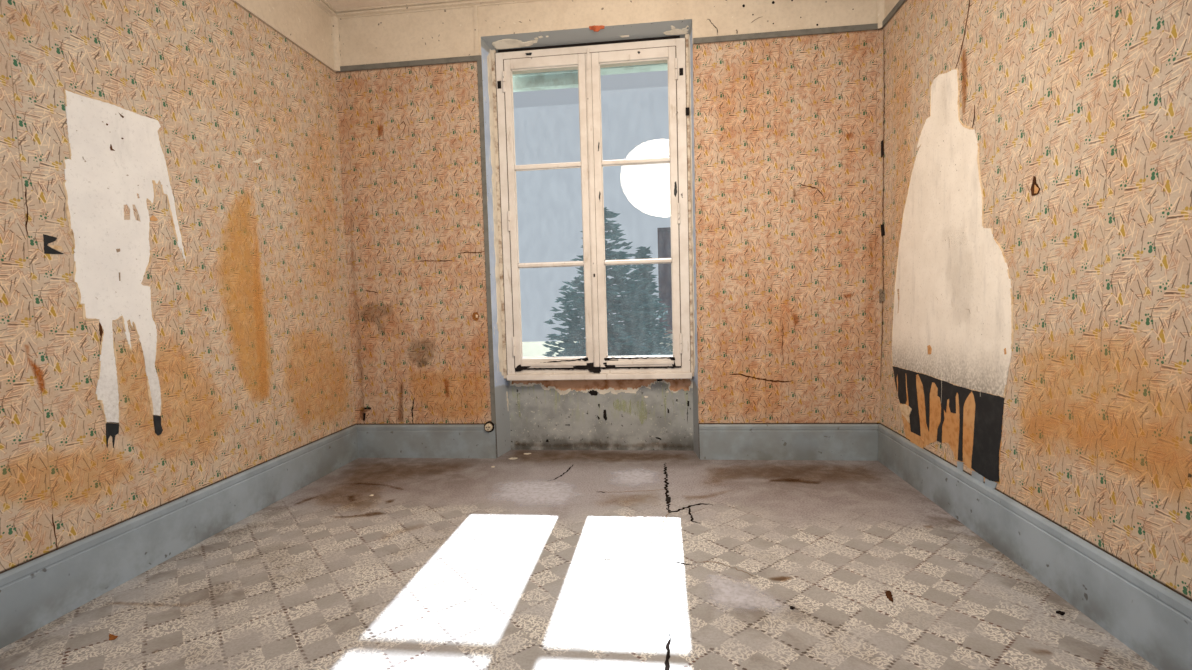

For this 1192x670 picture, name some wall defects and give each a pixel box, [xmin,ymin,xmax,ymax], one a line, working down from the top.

peeling [664,25,689,35]
flaking render [487,36,693,422]
peeling [899,404,924,449]
crack [600,463,712,556]